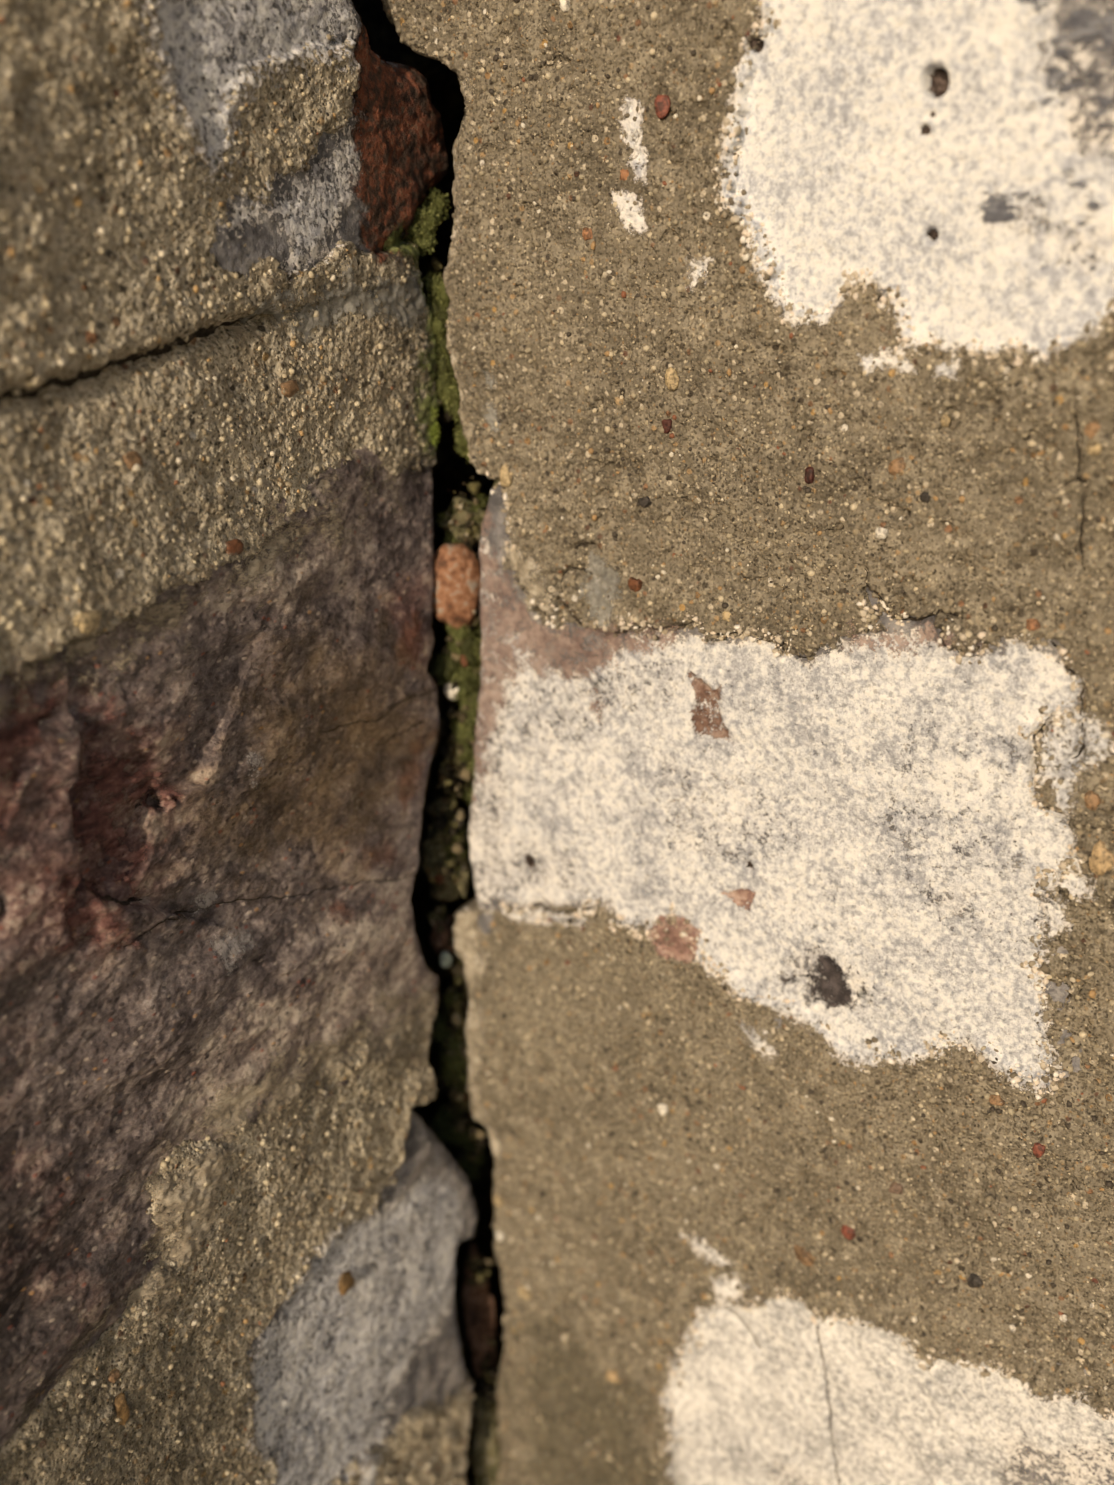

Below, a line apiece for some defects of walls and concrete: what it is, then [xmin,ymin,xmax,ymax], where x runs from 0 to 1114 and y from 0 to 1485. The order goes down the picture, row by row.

crack [0,317,252,401]
crack [352,0,466,301]
peeling [611,95,671,235]
peeling [686,256,714,288]
peeling [718,0,1114,381]
crack [89,401,807,1485]
peeling [468,523,1114,1093]
peeling [659,1232,1114,1485]